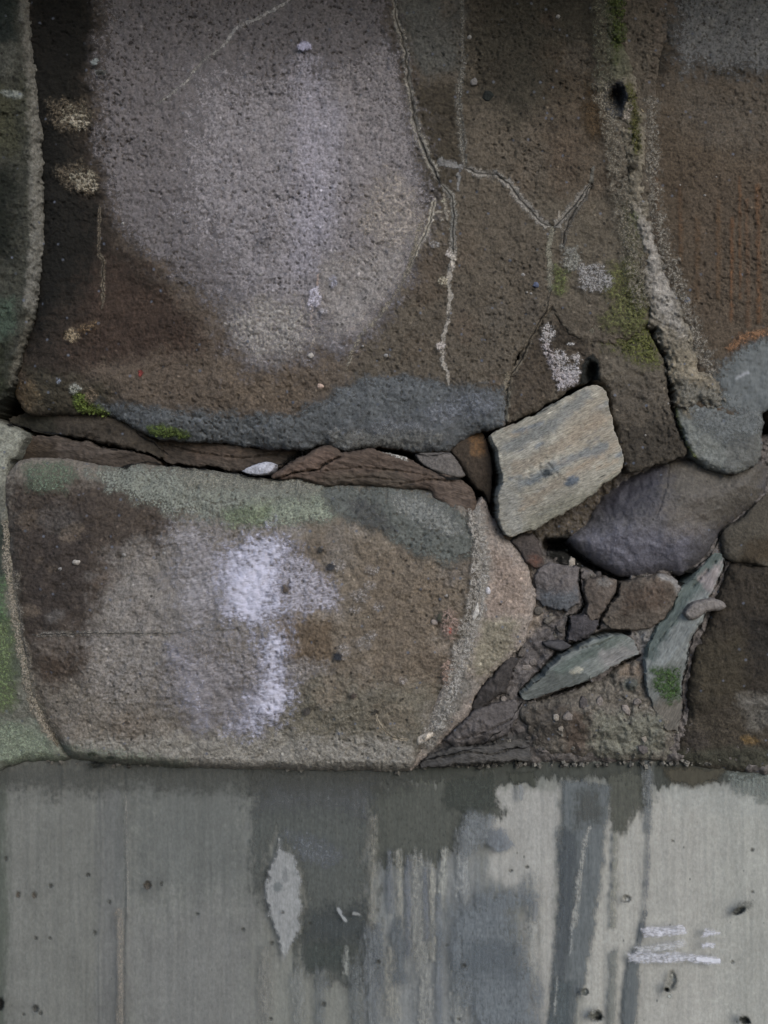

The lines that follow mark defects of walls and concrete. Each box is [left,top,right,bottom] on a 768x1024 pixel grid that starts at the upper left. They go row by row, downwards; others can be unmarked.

crack [392,0,595,423]
efflorescence [539,322,582,390]
efflorescence [559,244,613,293]
water stain [159,522,384,744]
water stain [0,760,768,1024]